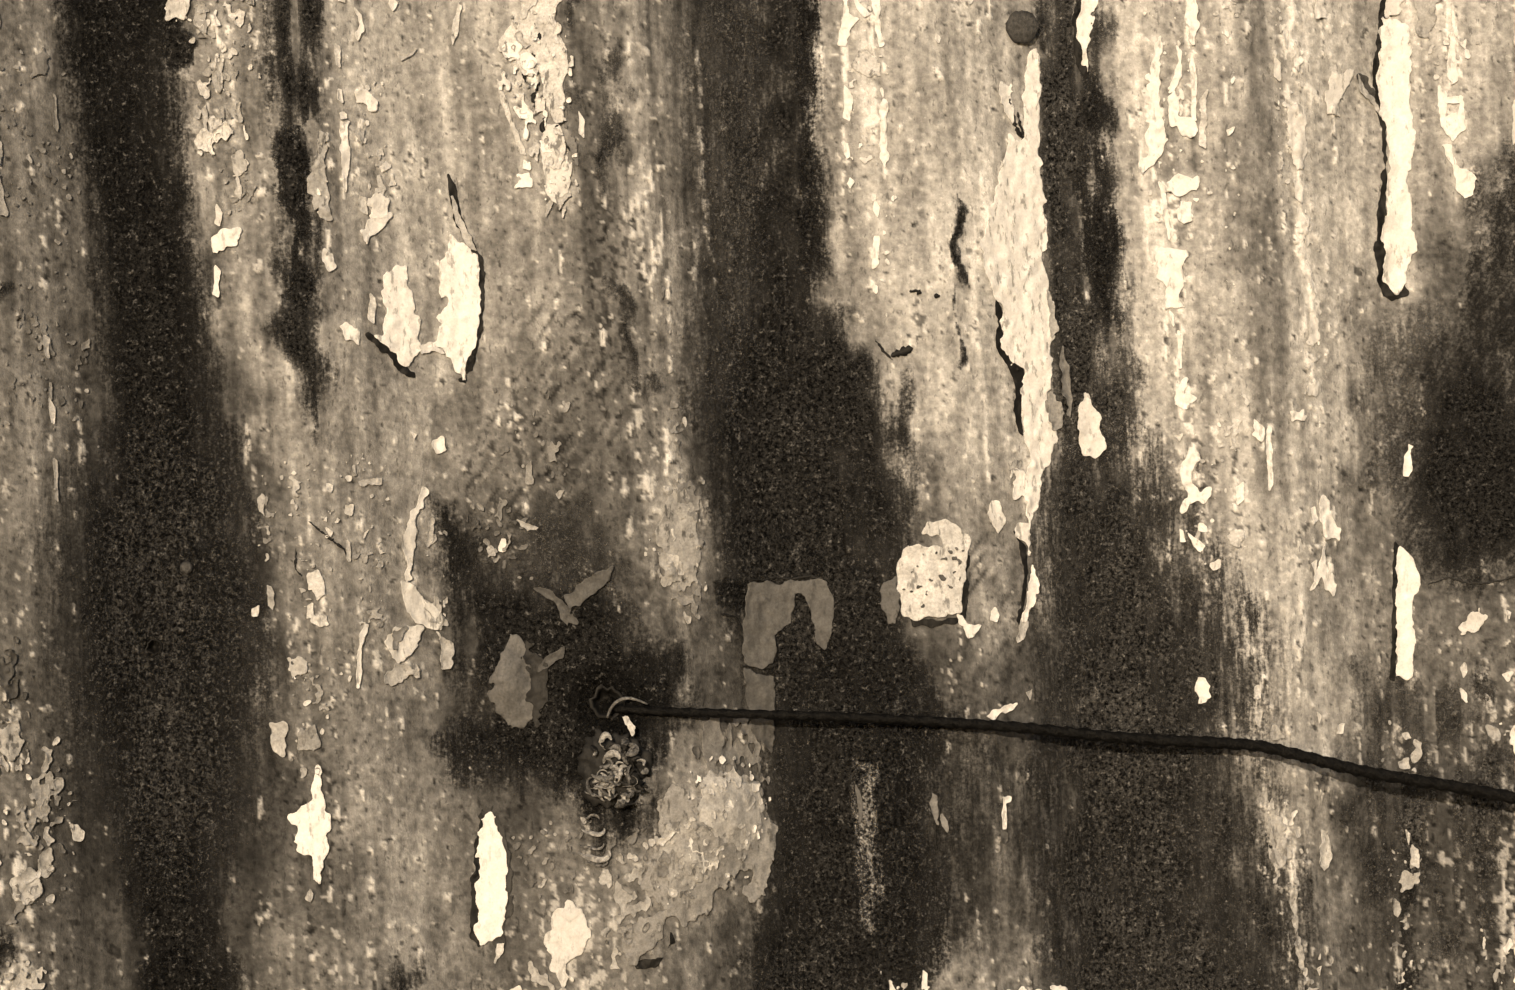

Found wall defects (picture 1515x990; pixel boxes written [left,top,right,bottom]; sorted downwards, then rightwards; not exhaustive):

leakage [39,0,280,990]
leakage [258,0,339,442]
peeling [257,453,455,902]
peeling [340,174,486,383]
leakage [429,497,699,868]
peeling [469,806,675,990]
leakage [681,0,986,990]
peeling [875,48,1107,643]
leakage [1007,0,1316,990]
peeling [1325,0,1479,301]
peeling [1389,542,1421,681]
leakage [1351,150,1515,598]